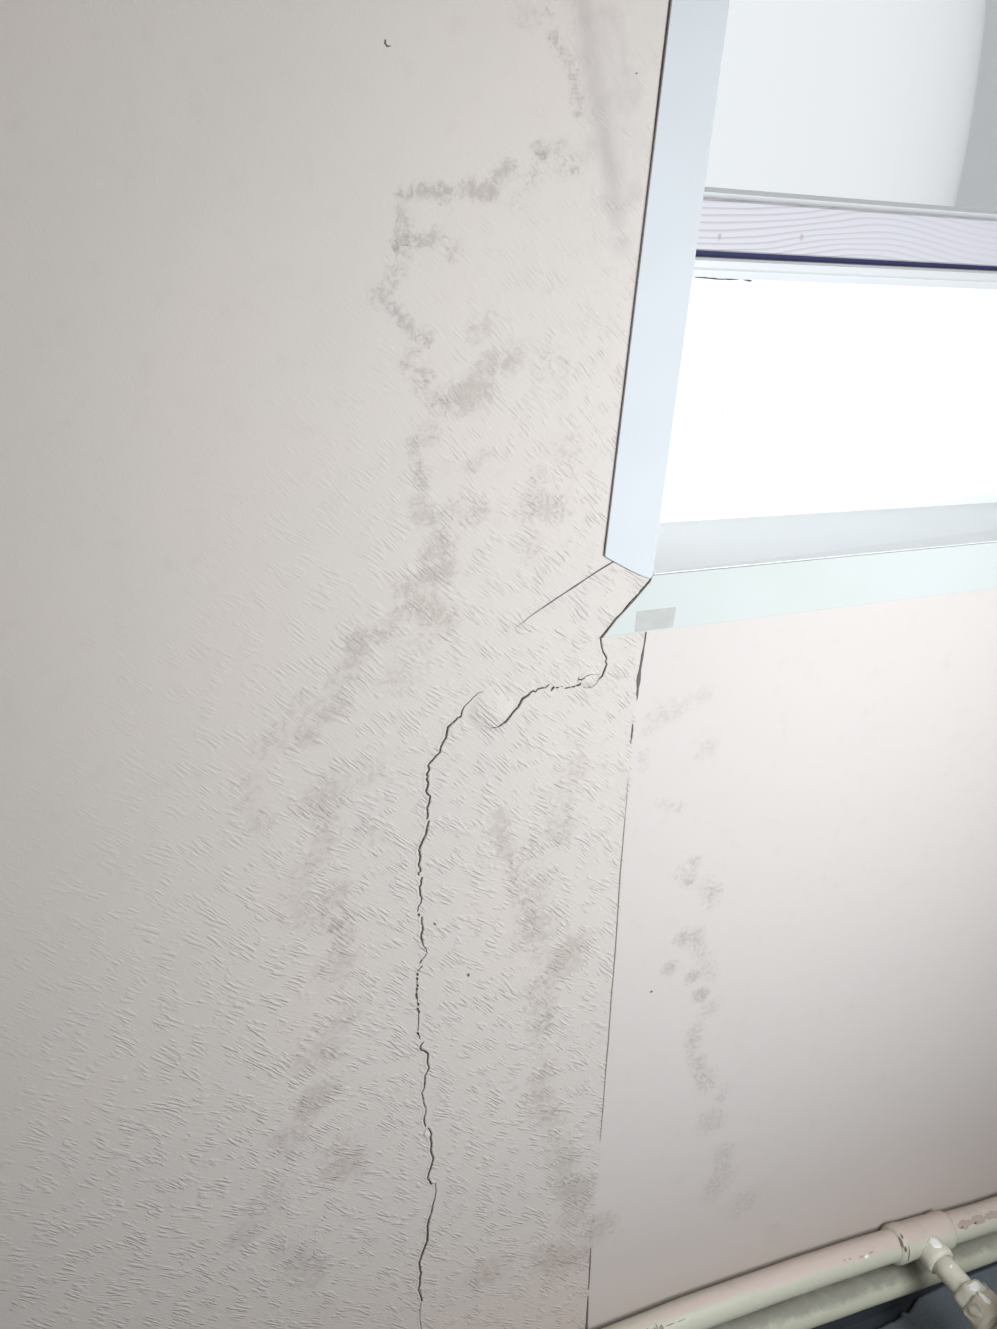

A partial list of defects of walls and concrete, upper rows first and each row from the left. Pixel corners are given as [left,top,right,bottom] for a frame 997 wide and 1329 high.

crack [414,572,656,1329]
crack [518,561,614,626]